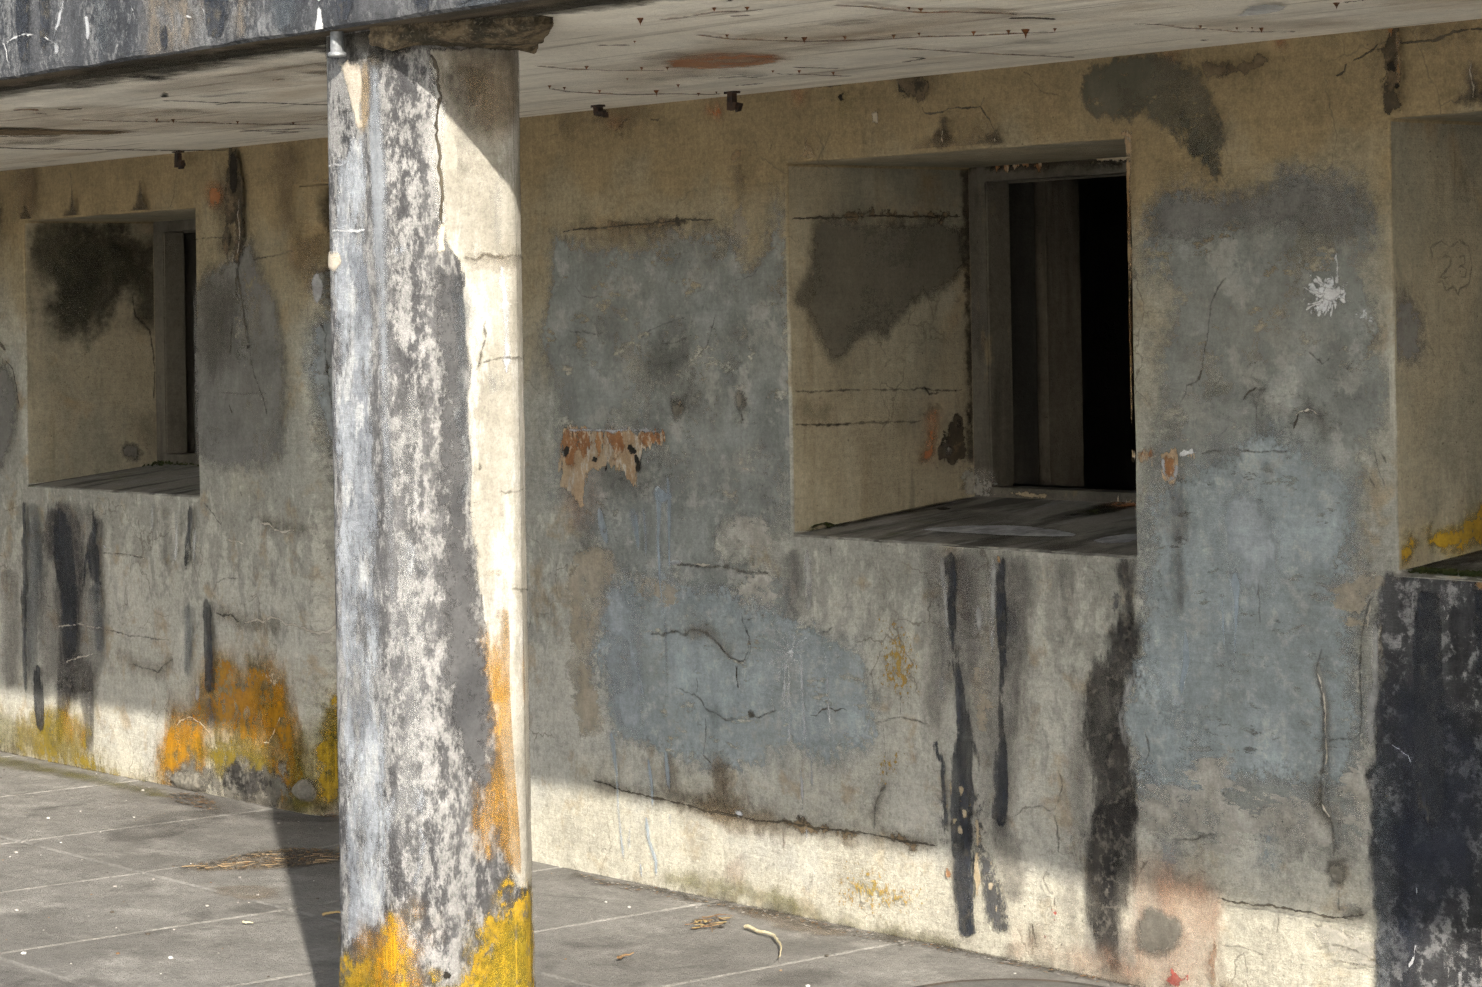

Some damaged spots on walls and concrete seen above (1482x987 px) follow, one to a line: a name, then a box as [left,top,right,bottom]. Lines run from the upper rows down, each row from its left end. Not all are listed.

leakage [793,206,965,361]
leakage [0,0,407,939]
peeling [430,47,532,888]
spalling [558,424,666,508]
leakage [402,542,415,574]
crack [651,629,846,762]
crack [594,772,937,851]
leakage [933,553,1009,937]
leakage [1070,534,1140,973]
leakage [404,932,418,957]
crack [1221,898,1363,968]